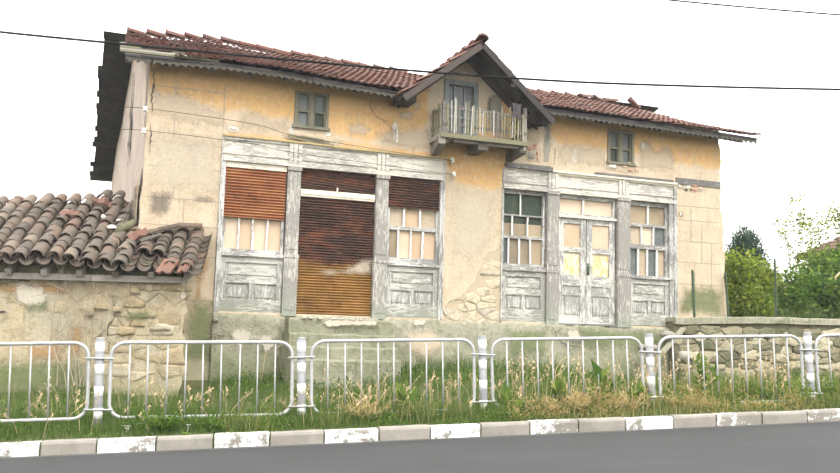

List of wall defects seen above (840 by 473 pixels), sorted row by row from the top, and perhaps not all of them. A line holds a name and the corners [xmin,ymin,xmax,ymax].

crack [127,69,156,164]
damp [152,194,169,211]
spalling [442,246,501,323]